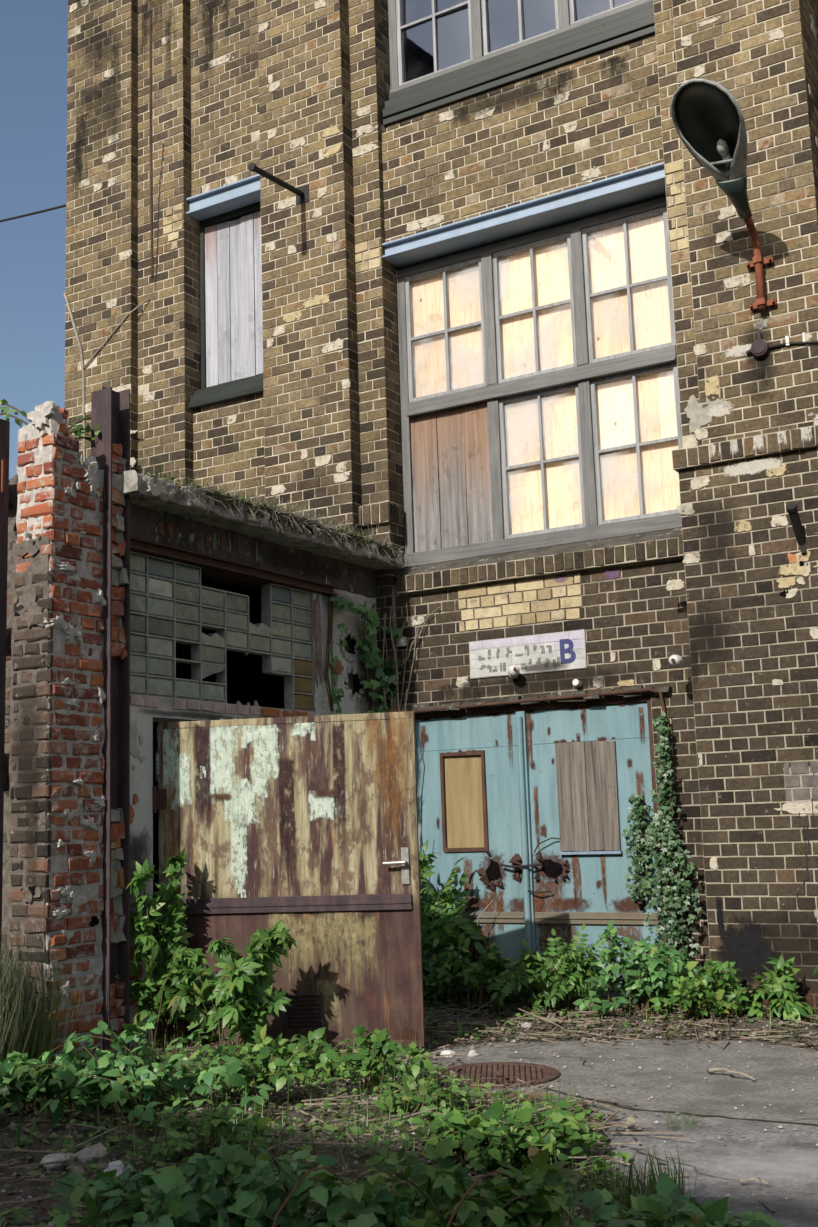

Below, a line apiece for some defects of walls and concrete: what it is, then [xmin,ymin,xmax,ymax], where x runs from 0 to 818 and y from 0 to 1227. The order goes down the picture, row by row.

leakage [203,0,228,48]
leakage [75,119,85,175]
flaking render [704,375,721,407]
spalling [776,551,818,599]
rust [194,725,231,813]
peeling [130,708,316,898]
rust [279,760,296,869]
peeling [308,791,346,821]
rust [312,723,346,834]
rust [449,855,589,963]
crack [514,1056,818,1126]
crack [606,1141,738,1180]